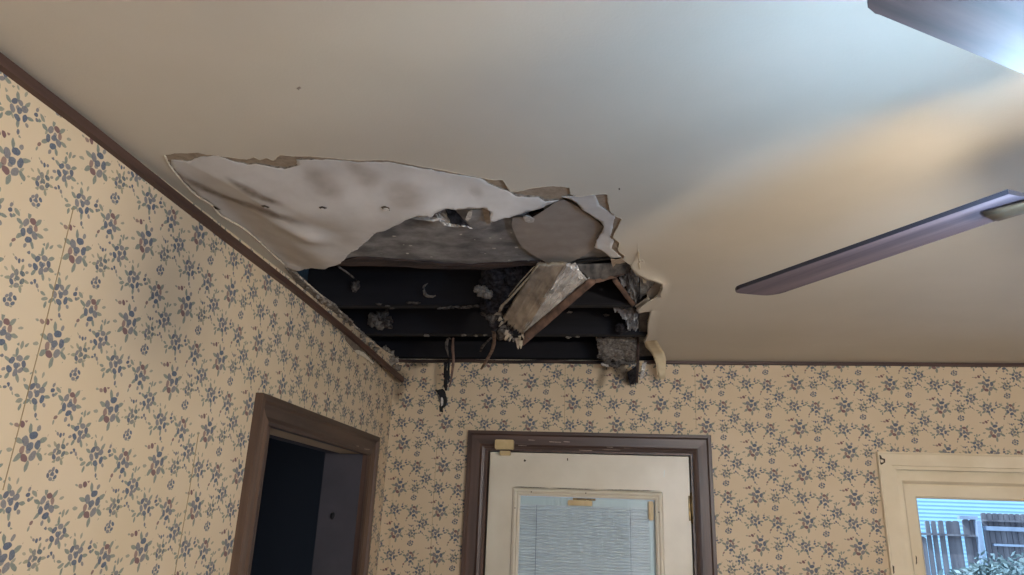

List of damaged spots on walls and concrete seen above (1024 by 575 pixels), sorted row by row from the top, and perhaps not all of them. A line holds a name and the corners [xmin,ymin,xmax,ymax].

peeling [388,160,672,379]